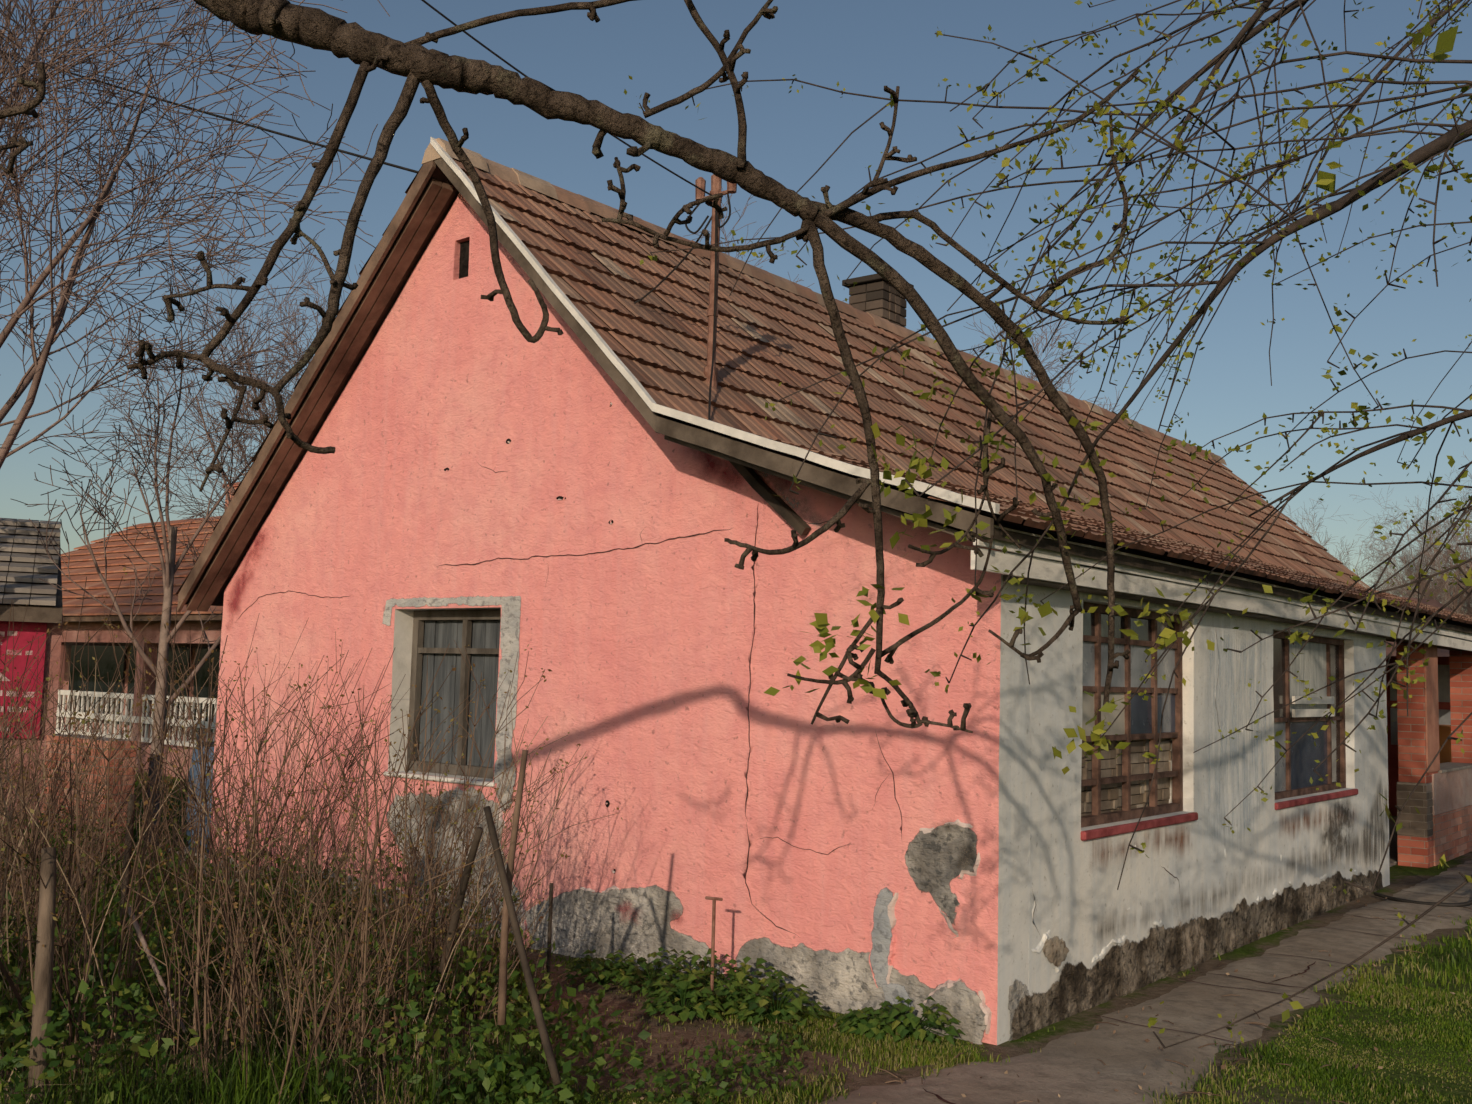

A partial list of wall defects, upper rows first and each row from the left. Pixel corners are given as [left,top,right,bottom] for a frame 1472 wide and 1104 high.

spalling [266,746,943,1032]
crack [437,502,853,938]
crack [872,732,905,843]
spalling [905,819,981,939]